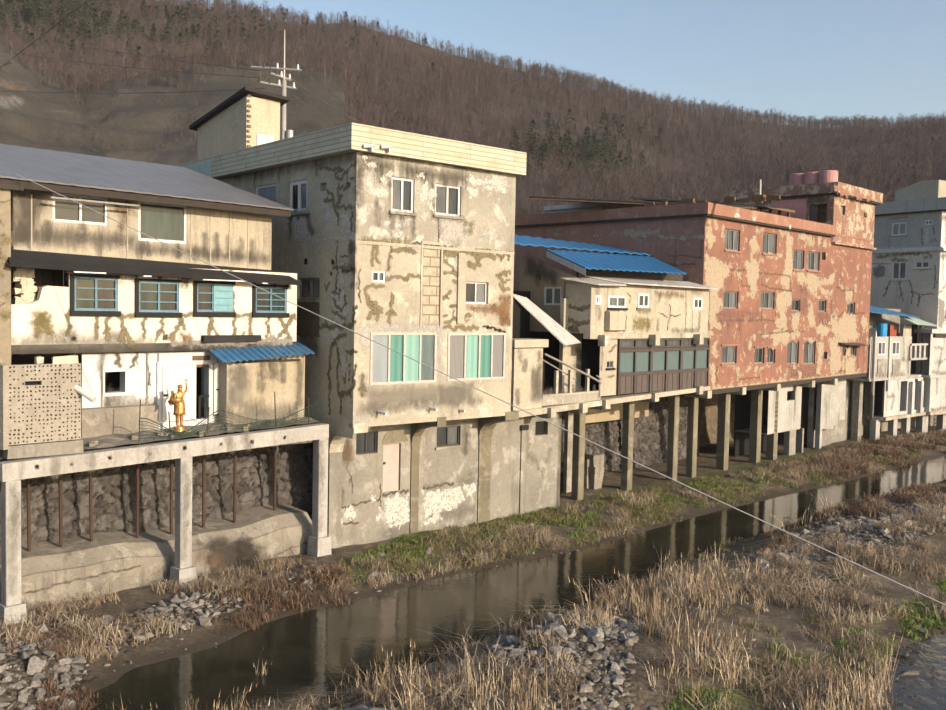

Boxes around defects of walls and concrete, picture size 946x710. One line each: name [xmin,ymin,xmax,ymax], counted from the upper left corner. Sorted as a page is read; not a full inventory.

peeling [358,155,394,185]
peeling [416,172,435,211]
peeling [466,184,506,199]
leakage [13,189,266,261]
crack [0,200,12,320]
crack [872,217,946,307]
crack [64,161,512,415]
peeling [553,217,869,390]
leakage [21,312,151,356]
leakage [171,335,317,352]
peeling [463,483,476,497]